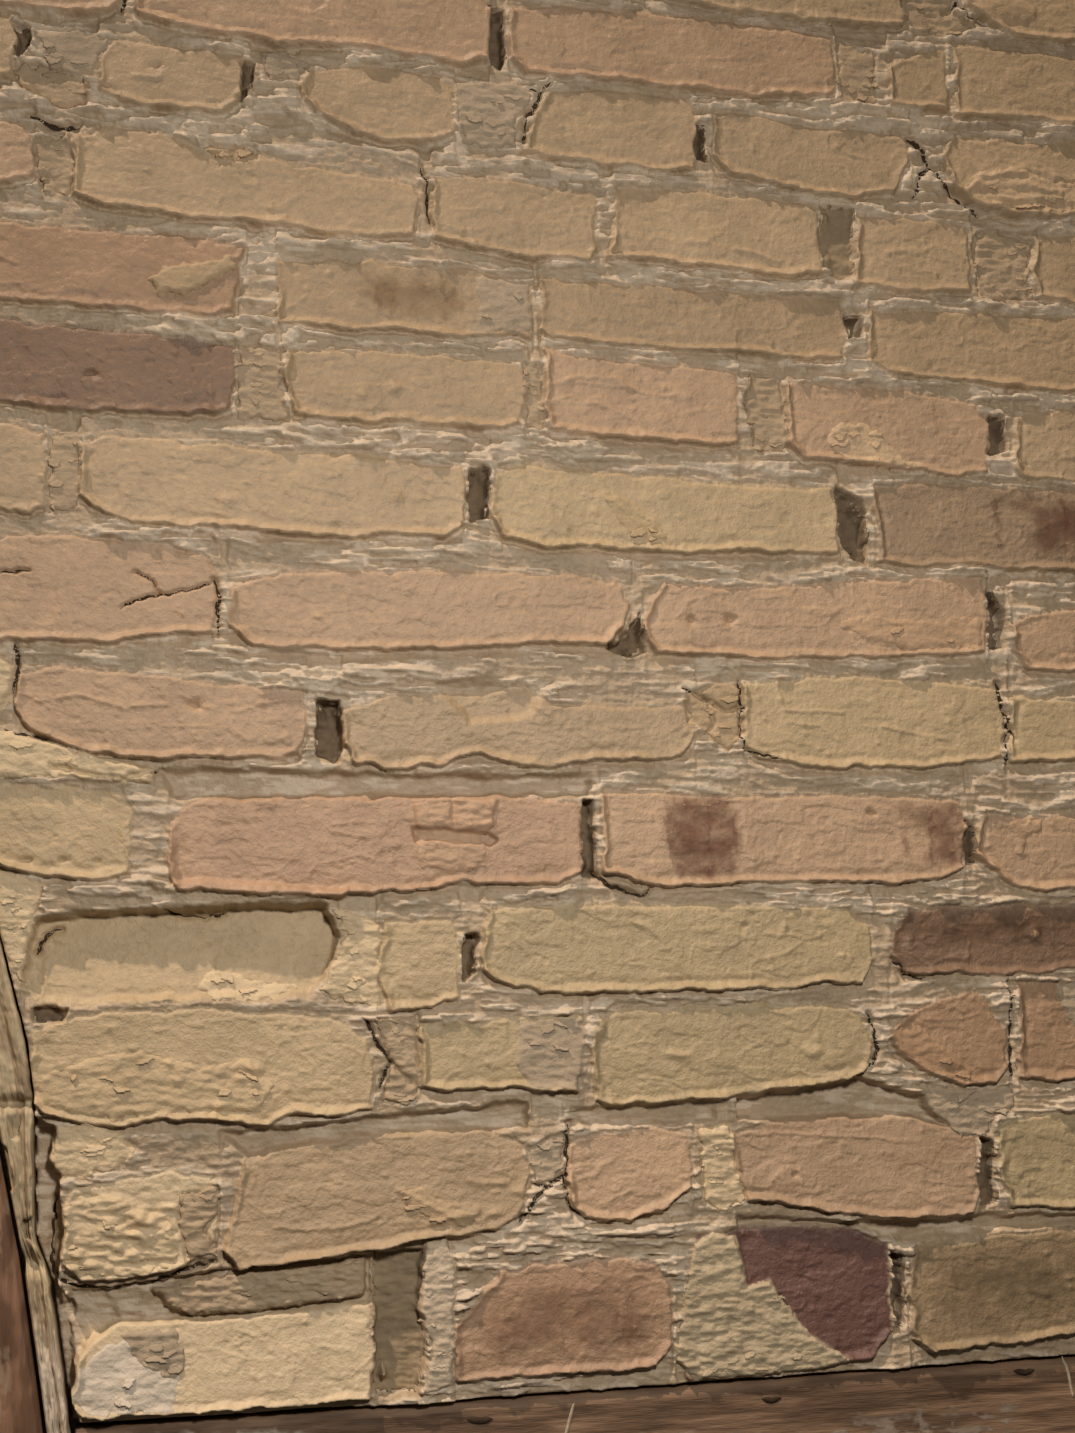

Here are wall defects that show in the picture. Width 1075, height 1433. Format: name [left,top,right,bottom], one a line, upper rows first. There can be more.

crack [906,140,977,218]
crack [122,572,222,634]
crack [364,1020,390,1089]